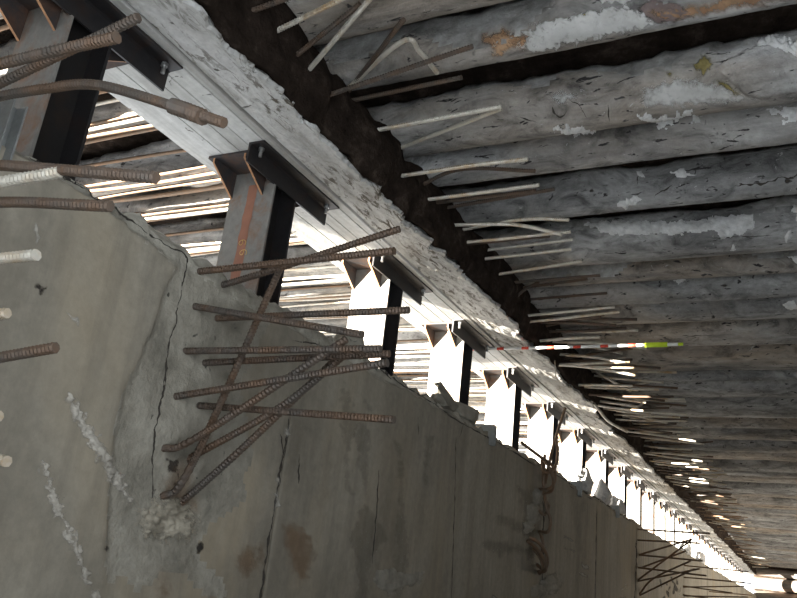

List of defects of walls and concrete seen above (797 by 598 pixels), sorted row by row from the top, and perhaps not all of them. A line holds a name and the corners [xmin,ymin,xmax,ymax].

rust [651,0,771,20]
rust [482,28,528,56]
crack [63,176,188,498]
spalling [138,496,201,544]